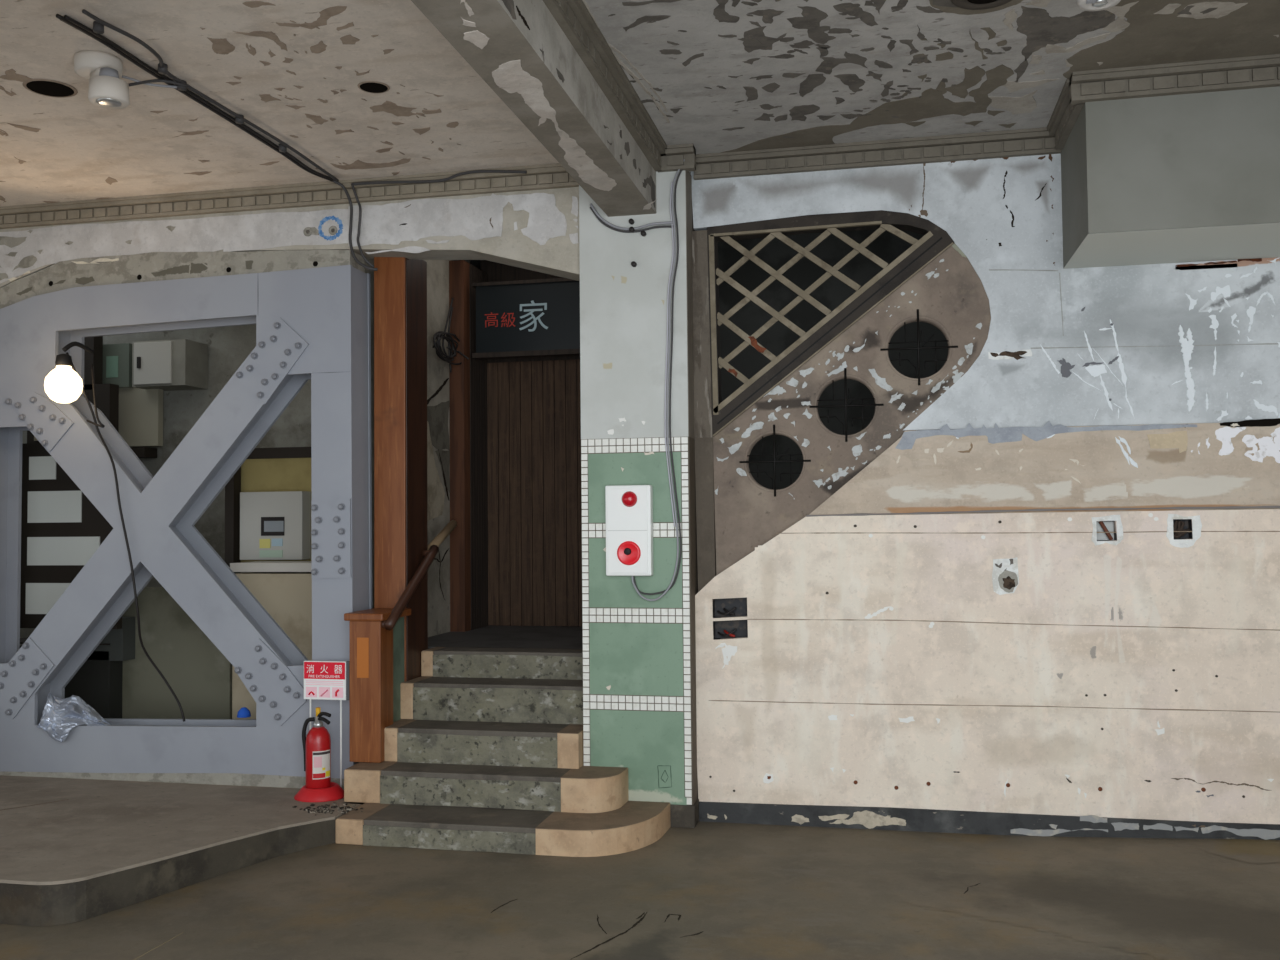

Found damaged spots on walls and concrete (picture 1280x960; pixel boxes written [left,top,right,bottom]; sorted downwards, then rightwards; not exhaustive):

peeling [200,6,461,176]
peeling [460,0,489,49]
peeling [492,60,617,191]
peeling [608,0,704,67]
peeling [704,0,1280,153]
peeling [0,193,579,284]
crack [986,171,1047,246]
crack [427,378,450,522]
peeling [717,320,1280,489]
peeling [792,810,906,829]
peeling [1010,815,1280,840]
crack [571,912,703,959]